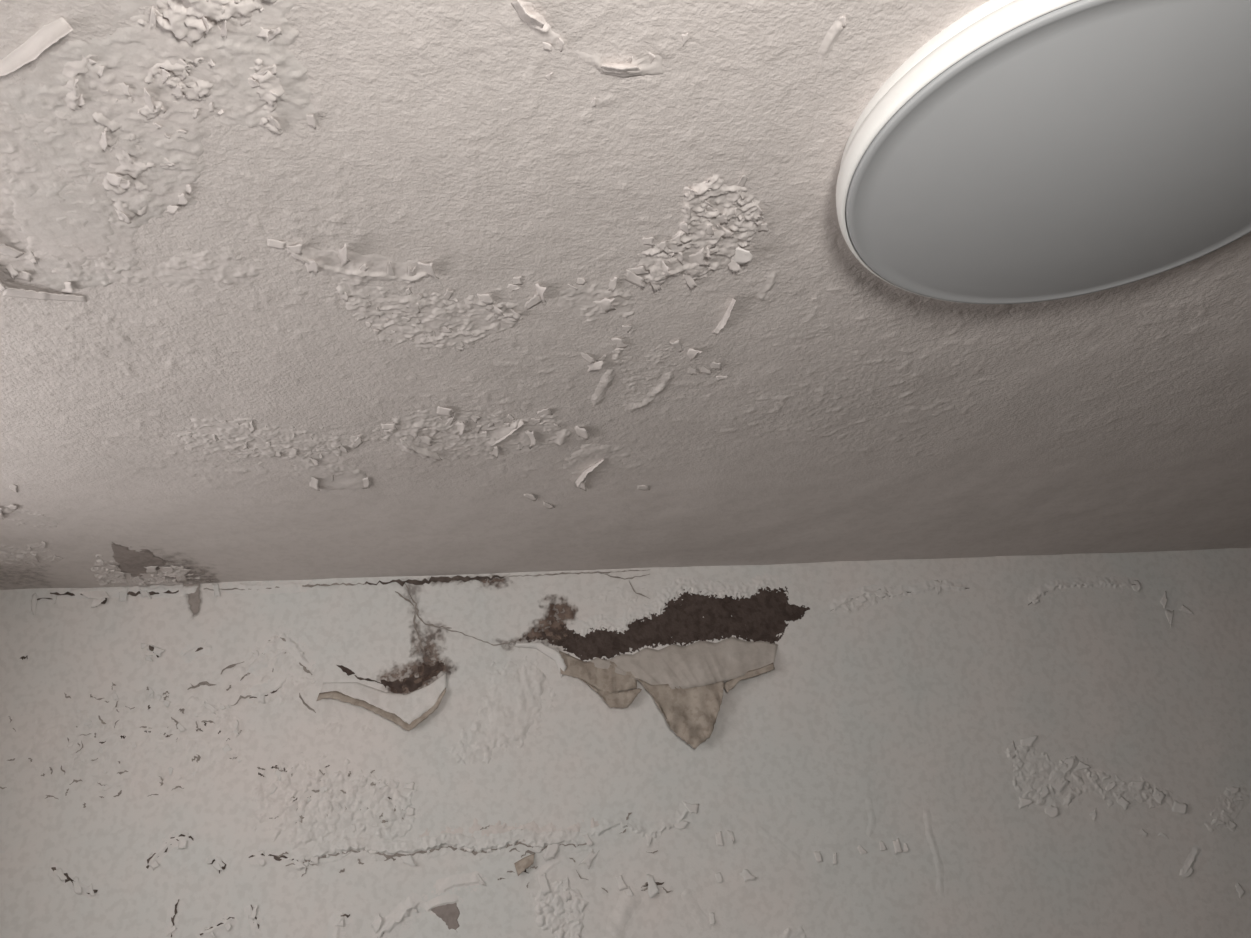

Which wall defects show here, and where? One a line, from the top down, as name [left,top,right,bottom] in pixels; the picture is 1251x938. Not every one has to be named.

peeling [511,0,664,78]
peeling [0,0,320,302]
peeling [267,174,769,413]
peeling [172,406,637,492]
spalling [79,542,215,607]
spalling [315,645,453,736]
spalling [515,574,810,749]
peeling [246,752,699,938]